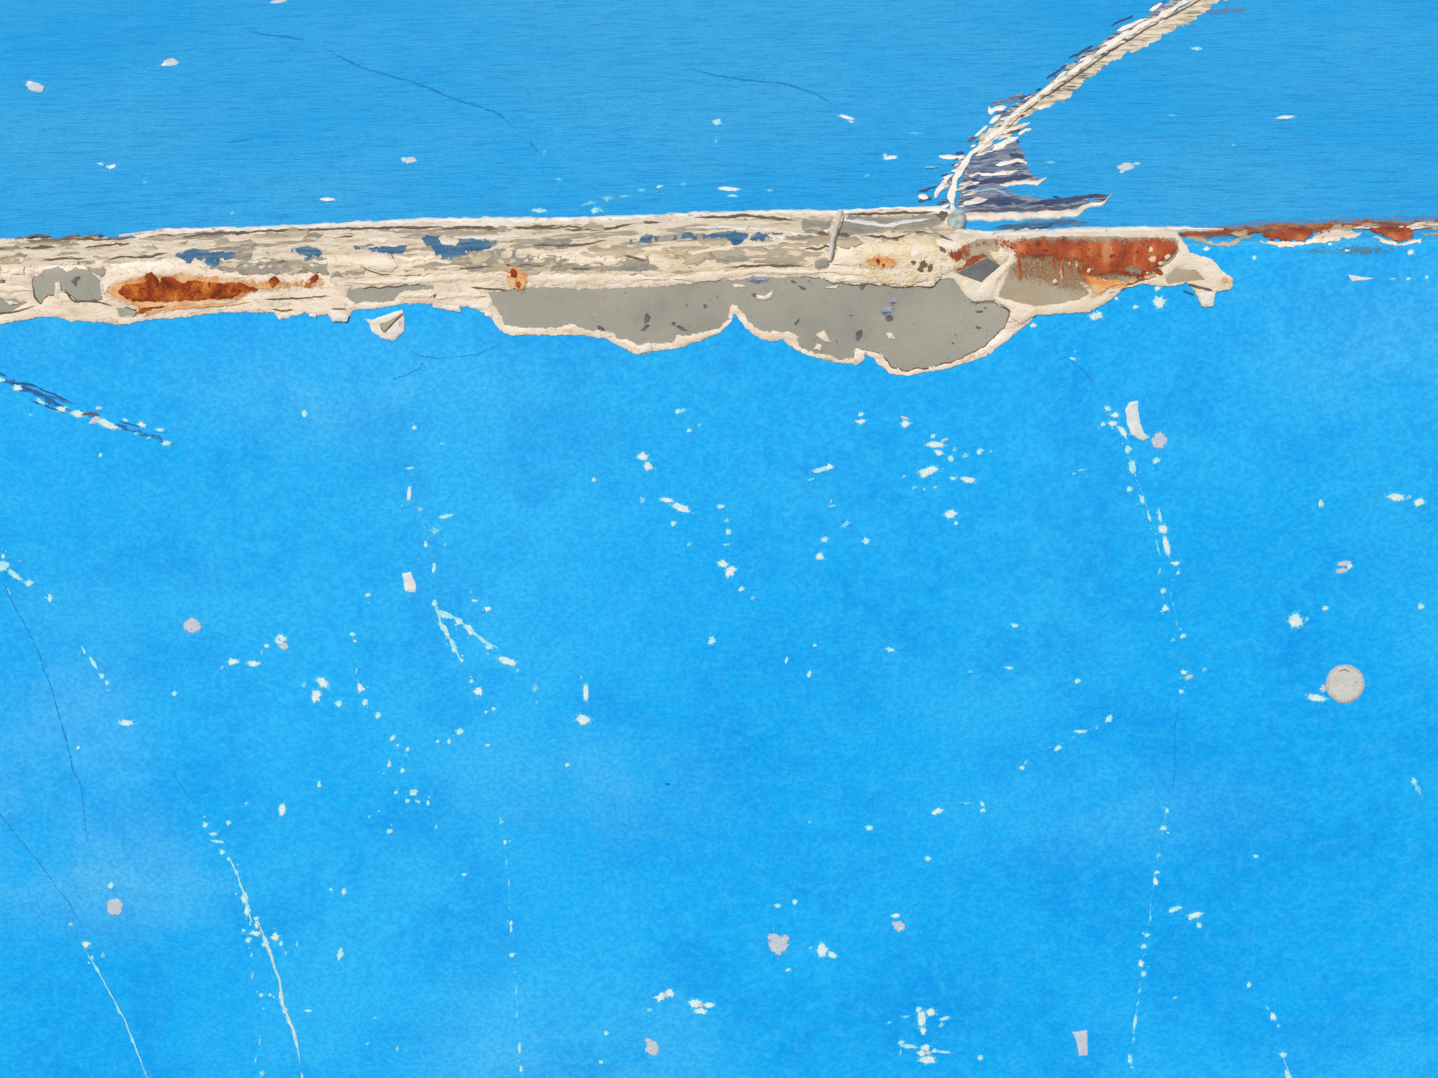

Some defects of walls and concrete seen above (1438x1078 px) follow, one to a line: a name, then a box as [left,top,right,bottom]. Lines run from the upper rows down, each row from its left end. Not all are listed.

peeling [0,0,1244,376]
rust [105,270,329,316]
rust [947,215,1438,297]
peeling [1100,401,1182,612]
peeling [1304,664,1365,703]
peeling [81,940,105,974]
peeling [202,821,299,1016]